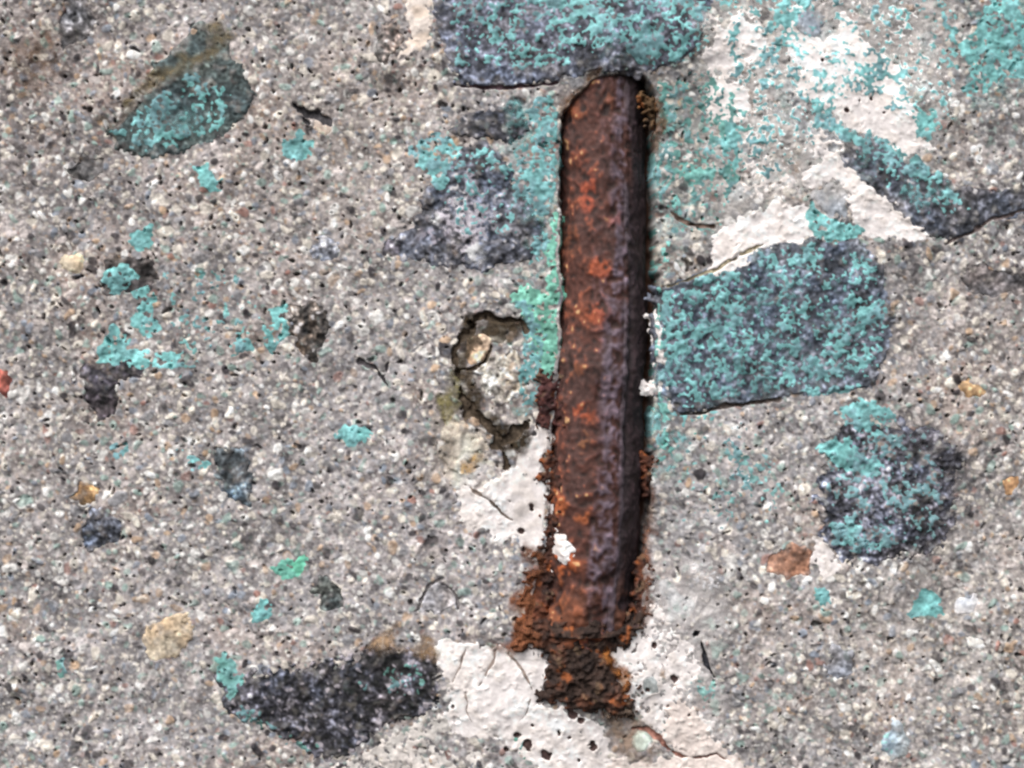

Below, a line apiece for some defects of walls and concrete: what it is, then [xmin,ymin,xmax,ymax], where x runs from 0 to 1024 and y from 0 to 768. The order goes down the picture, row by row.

corrosion [636,91,667,147]
corrosion [510,368,659,720]
spalling [330,0,1024,768]